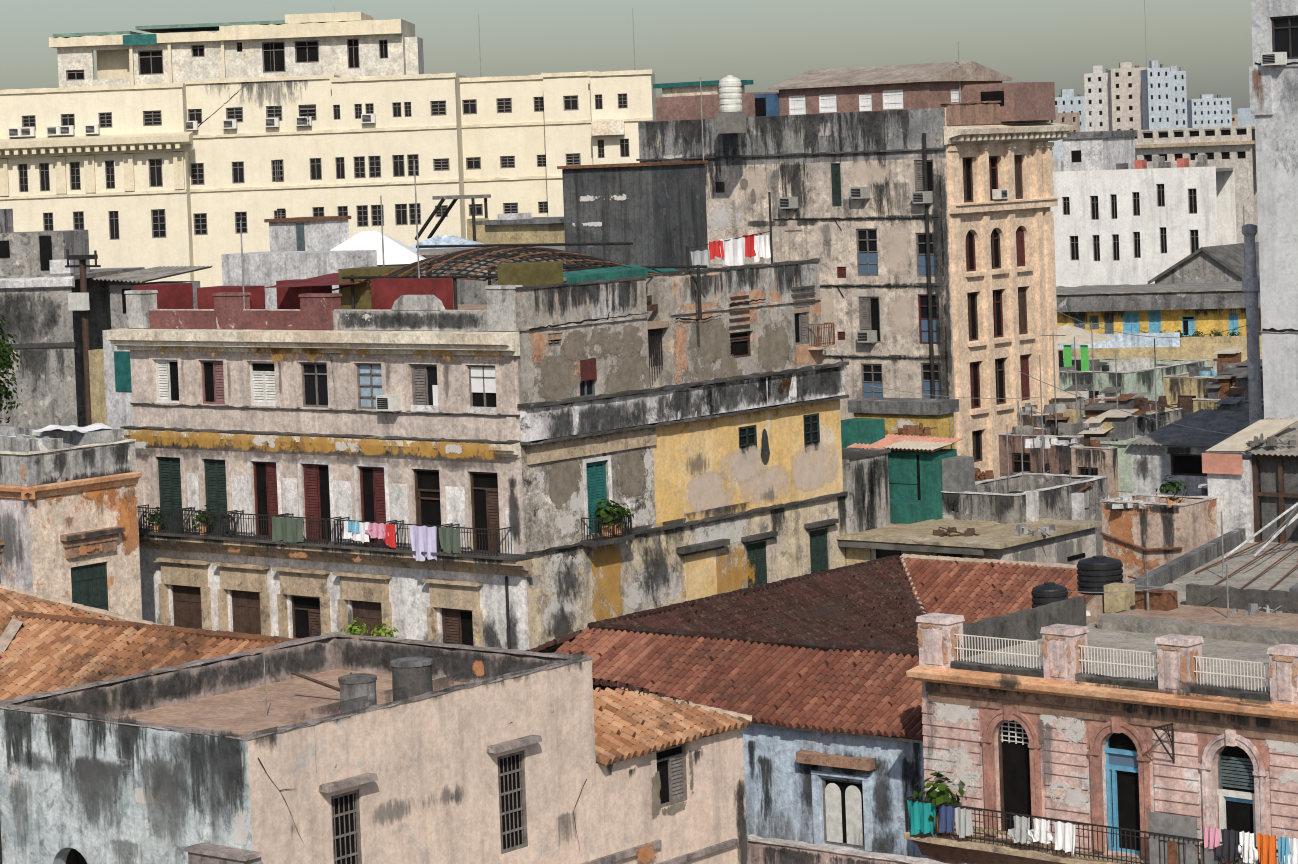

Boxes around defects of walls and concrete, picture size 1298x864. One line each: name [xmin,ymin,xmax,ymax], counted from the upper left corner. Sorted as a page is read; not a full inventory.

water stain [534,110,952,443]
flaking render [672,289,828,394]
water stain [546,546,580,640]
peeling [540,544,686,630]
water stain [627,502,747,607]
peeling [693,444,837,594]
water stain [338,610,584,698]
water stain [2,630,326,817]
water stain [303,696,367,722]
peeling [933,702,979,725]
peeling [1040,714,1086,743]
peeling [1265,739,1298,754]